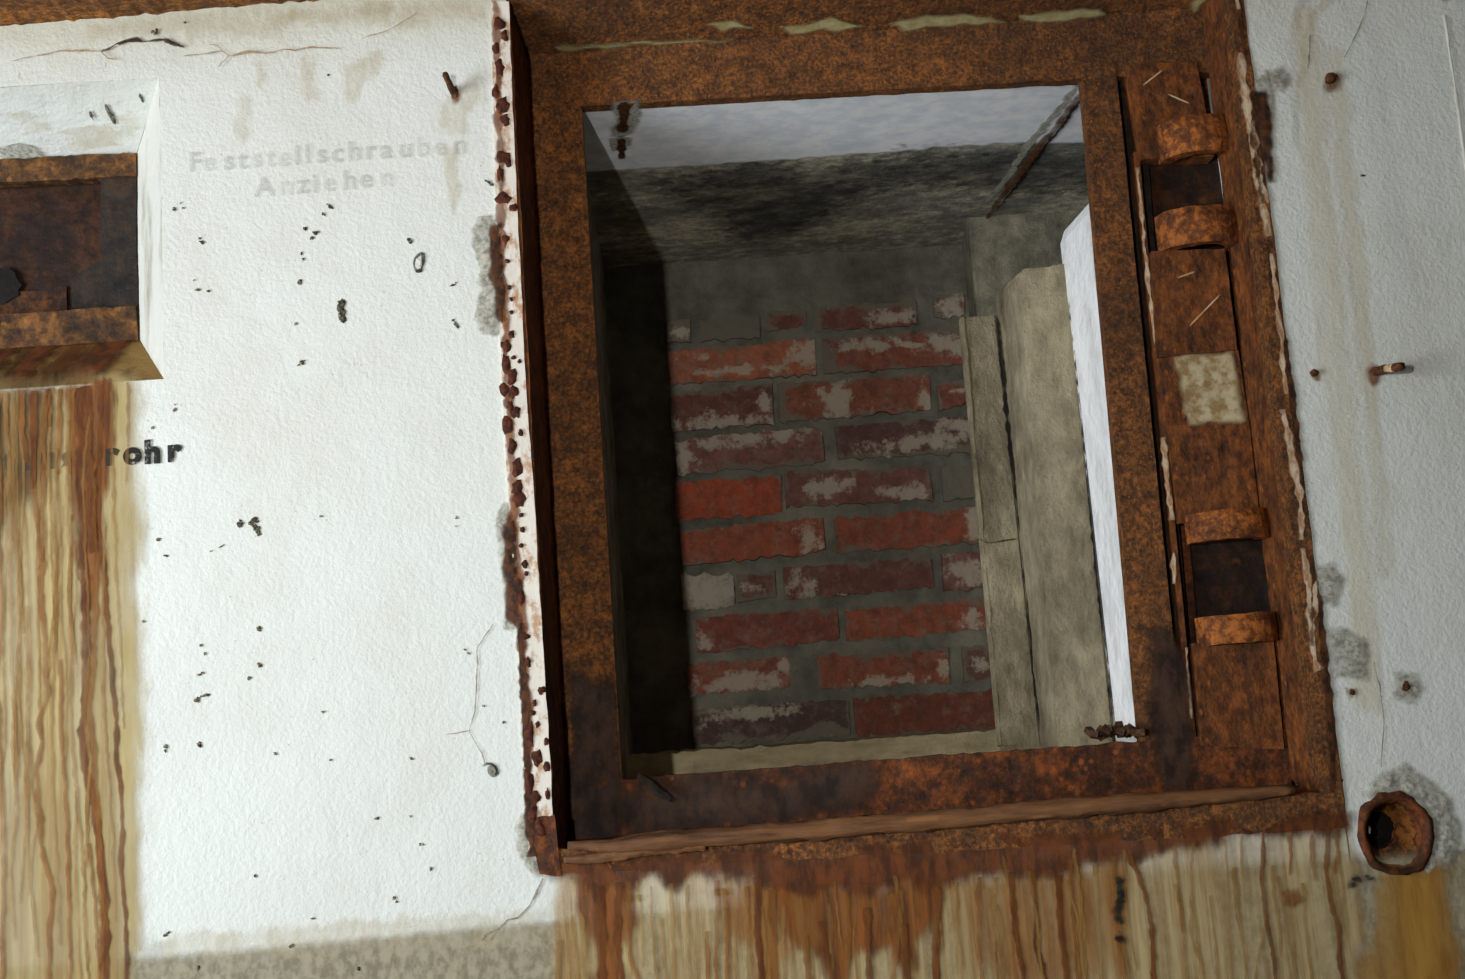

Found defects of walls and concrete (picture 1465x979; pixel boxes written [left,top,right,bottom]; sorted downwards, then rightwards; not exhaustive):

crack [13,14,415,66]
rust [610,101,641,159]
rust [985,85,1080,219]
peeling [1270,255,1288,394]
rust [1280,335,1306,513]
peeling [1281,413,1368,679]
rust [0,340,140,979]
rust [1310,563,1350,792]
rust [1395,674,1421,700]
rust [555,812,1458,979]